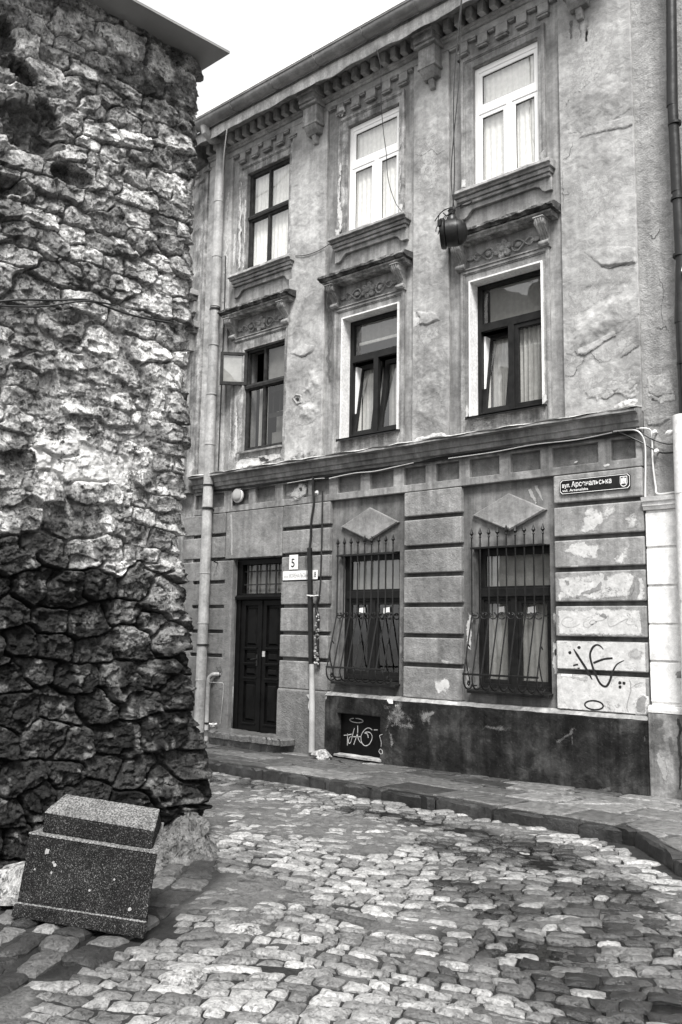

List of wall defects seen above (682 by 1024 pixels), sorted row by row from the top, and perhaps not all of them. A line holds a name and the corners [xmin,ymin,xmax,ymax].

peeling [434,678,450,694]
peeling [552,506,649,716]